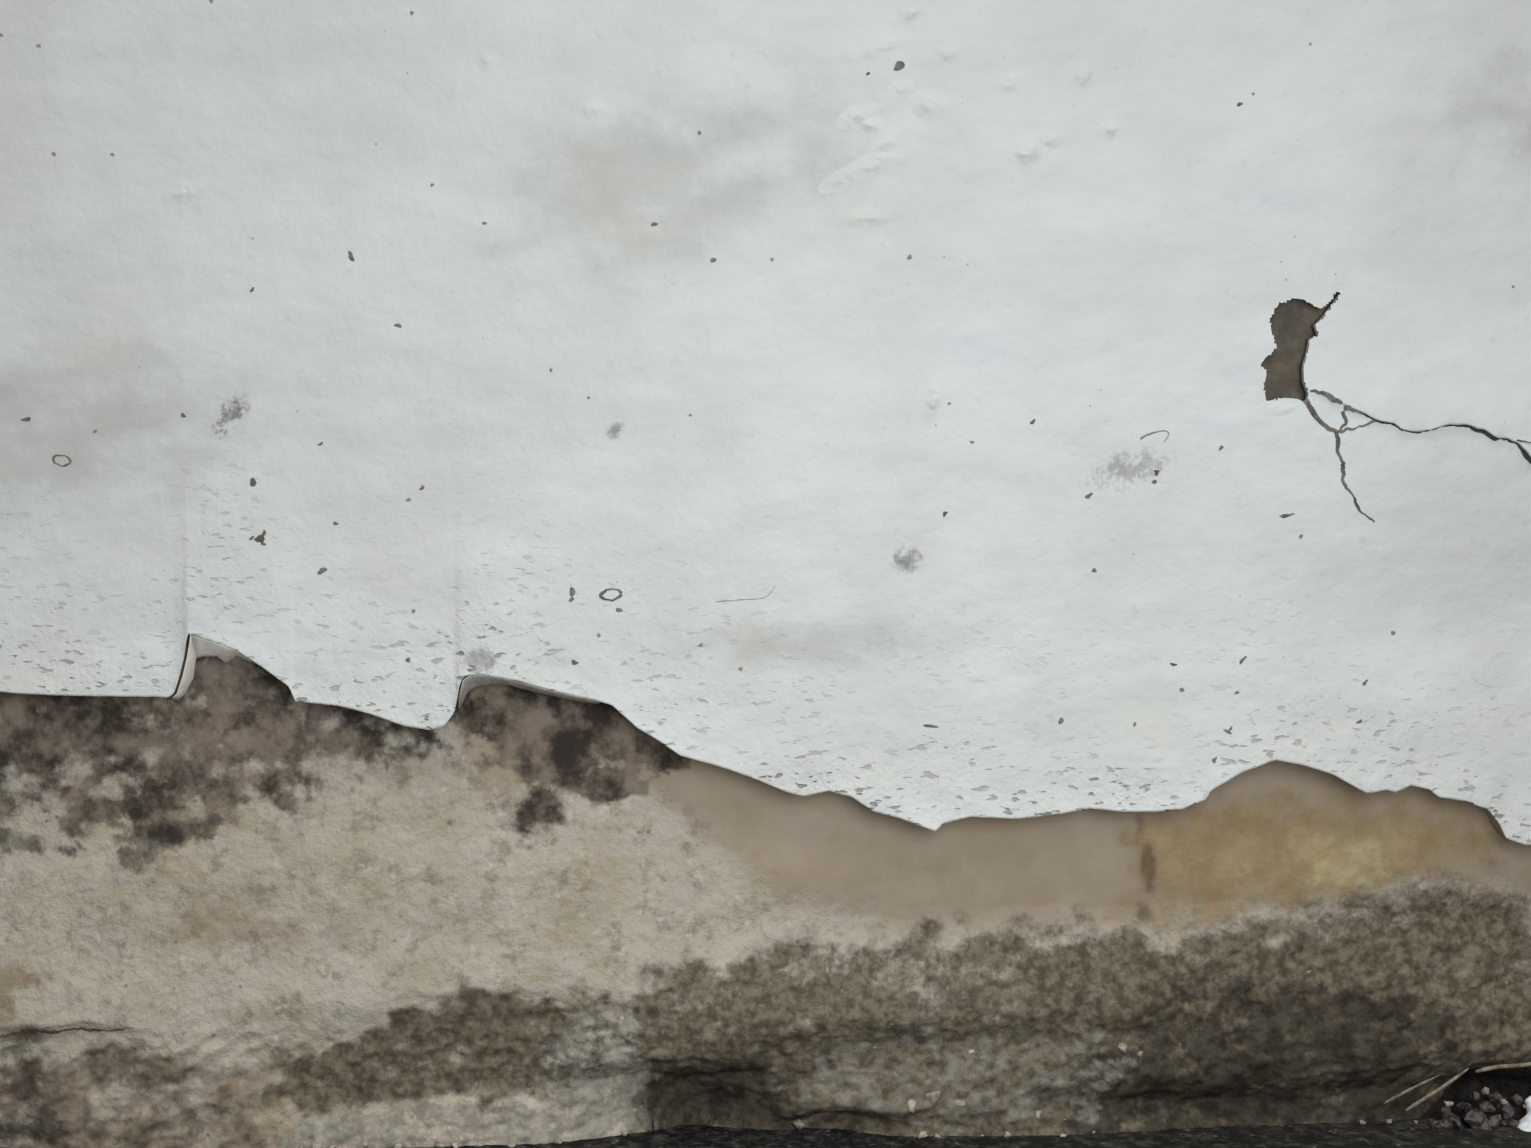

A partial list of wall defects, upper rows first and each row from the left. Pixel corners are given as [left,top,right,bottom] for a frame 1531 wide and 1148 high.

hole [1261,292,1341,417]
crack [1303,389,1531,522]
mould [0,656,442,870]
spalling [0,634,1531,1148]
damp [279,1008,667,1148]